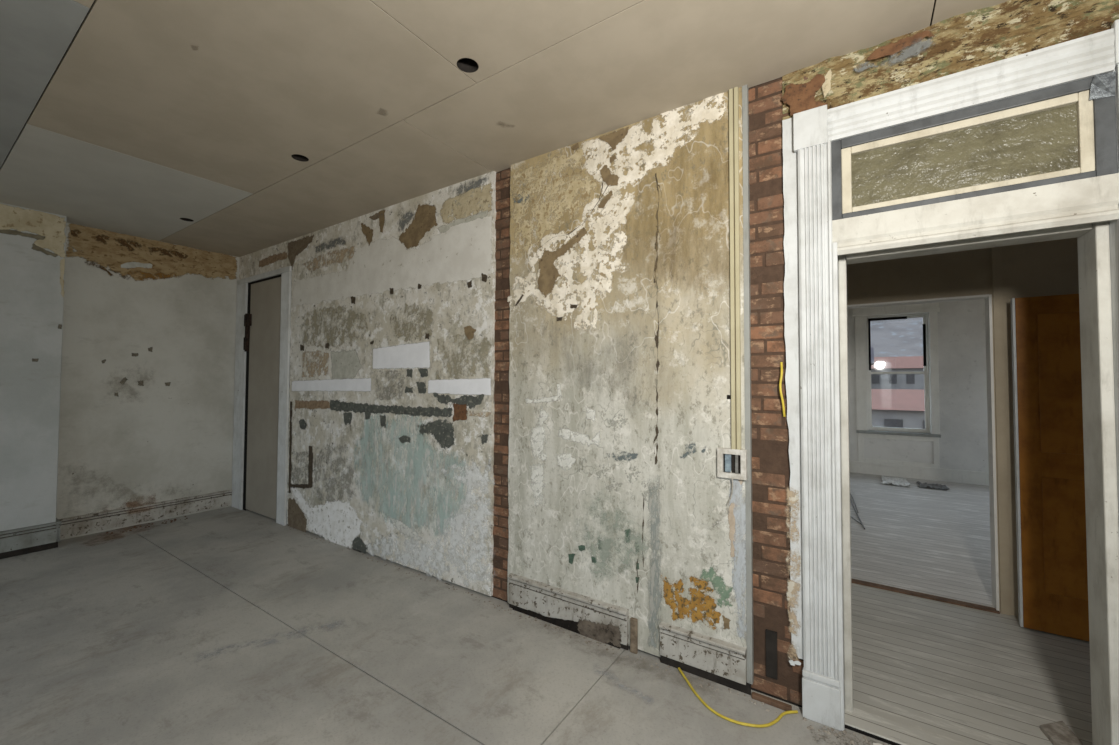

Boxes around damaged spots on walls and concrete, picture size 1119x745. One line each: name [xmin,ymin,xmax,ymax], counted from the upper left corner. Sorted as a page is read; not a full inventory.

flaking render [854,30,935,72]
peeling [0,204,238,297]
flaking render [259,210,385,271]
peeling [300,296,374,379]
peeling [376,93,727,601]
peeling [343,412,386,428]
peeling [287,401,368,554]